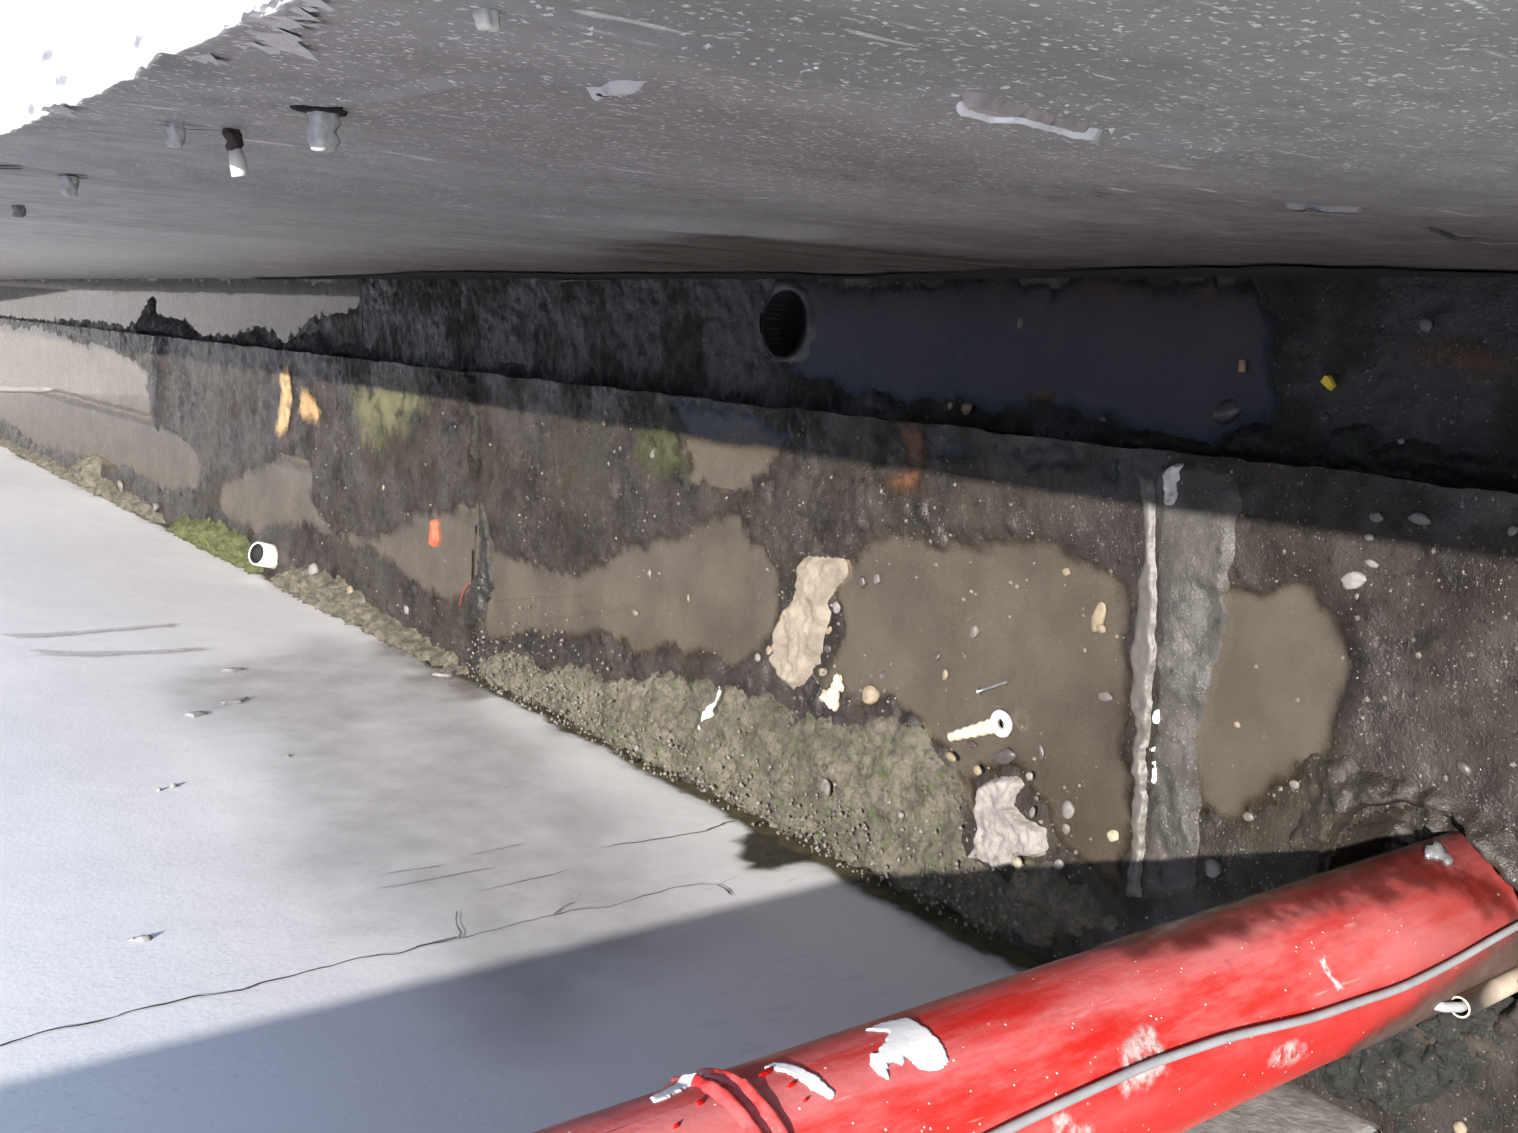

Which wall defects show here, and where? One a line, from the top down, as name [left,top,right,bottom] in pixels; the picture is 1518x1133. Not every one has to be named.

spalling [225,0,334,62]
spalling [166,49,231,66]
peeling [956,92,1116,142]
corrosion [895,427,924,488]
crack [598,821,734,849]
damp [739,821,815,869]
crack [0,844,736,1046]